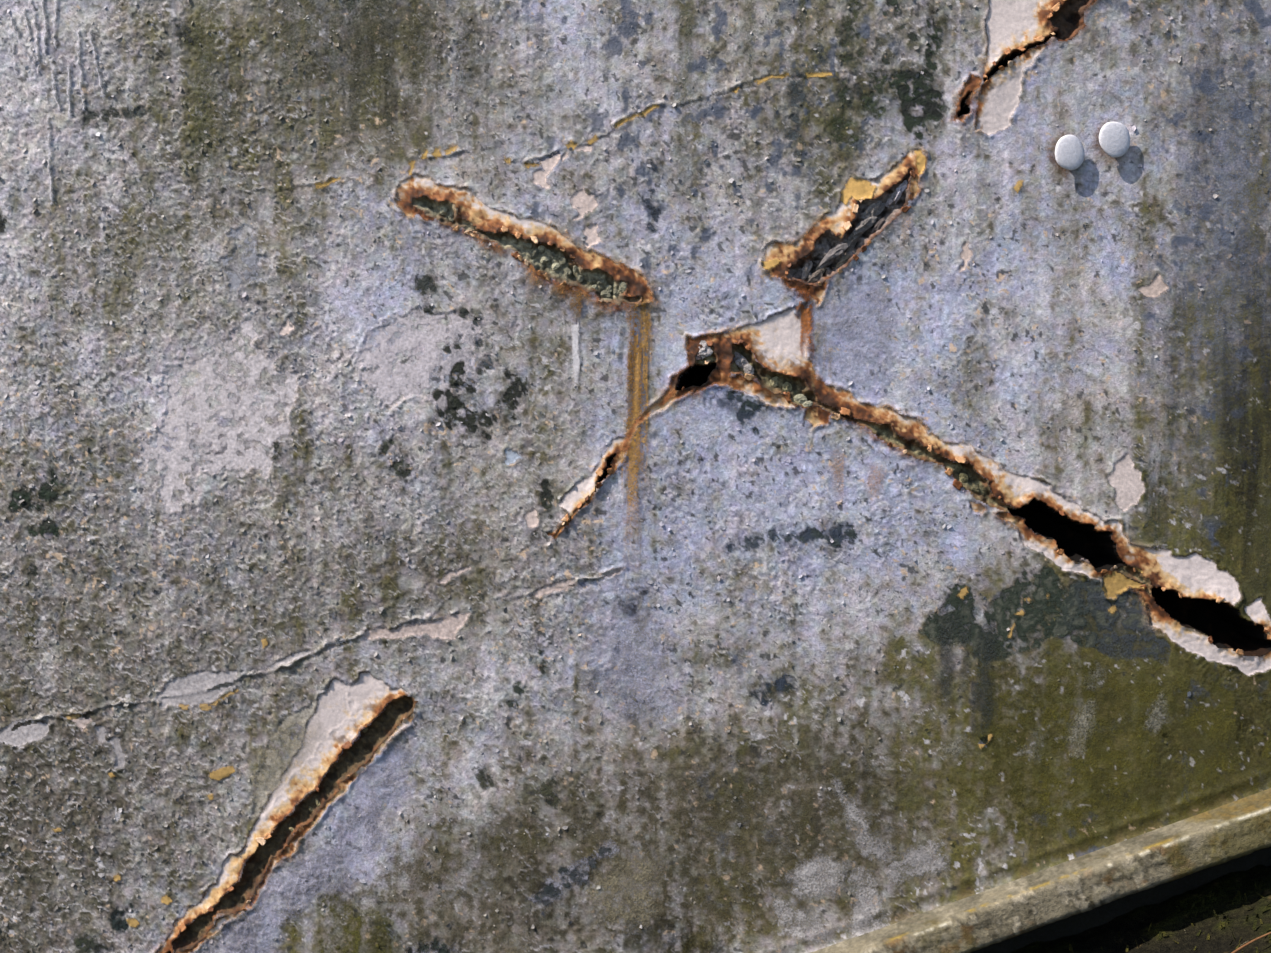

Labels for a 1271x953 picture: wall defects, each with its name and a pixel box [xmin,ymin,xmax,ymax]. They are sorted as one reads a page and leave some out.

water stain [175,1,244,150]
water stain [269,0,440,117]
peeling [614,0,928,329]
peeling [889,141,980,264]
water stain [8,457,65,540]
peeling [0,0,606,953]
corrosion [620,304,651,523]
peeling [811,472,917,558]
crack [547,149,1271,676]
peeling [895,355,987,447]
peeling [618,551,902,691]
water stain [919,566,1170,726]